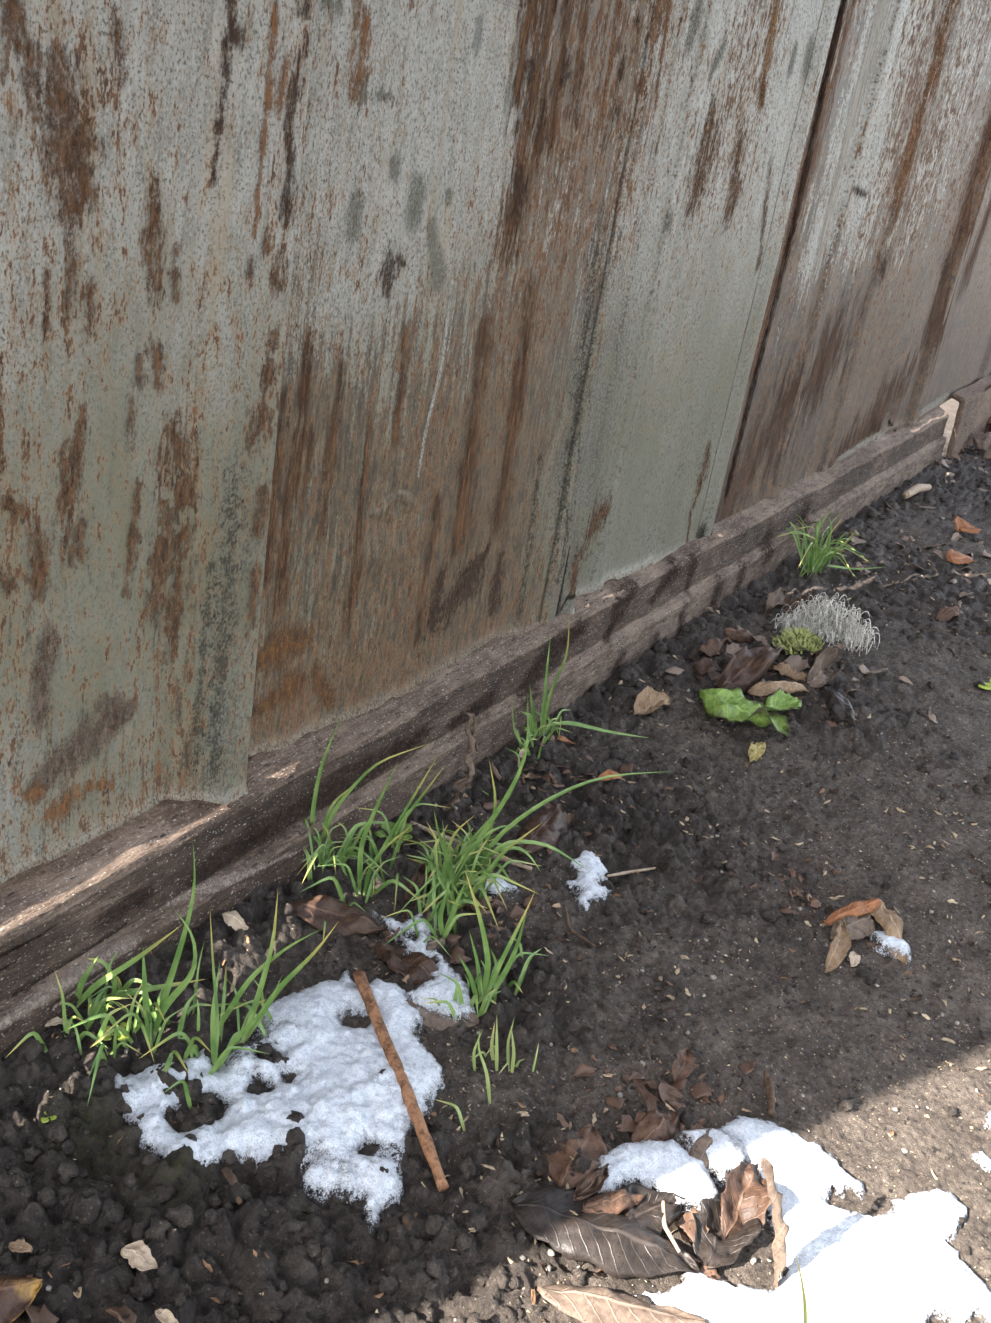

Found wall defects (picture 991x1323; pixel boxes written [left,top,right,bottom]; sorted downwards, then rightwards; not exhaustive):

rust [0,0,105,343]
rust [140,167,182,314]
rust [210,0,246,187]
rust [253,1,291,239]
rust [495,0,588,268]
rust [682,0,782,236]
rust [749,0,855,376]
rust [817,116,991,472]
rust [0,401,94,618]
rust [122,410,199,667]
rust [263,330,347,612]
rust [410,273,541,649]